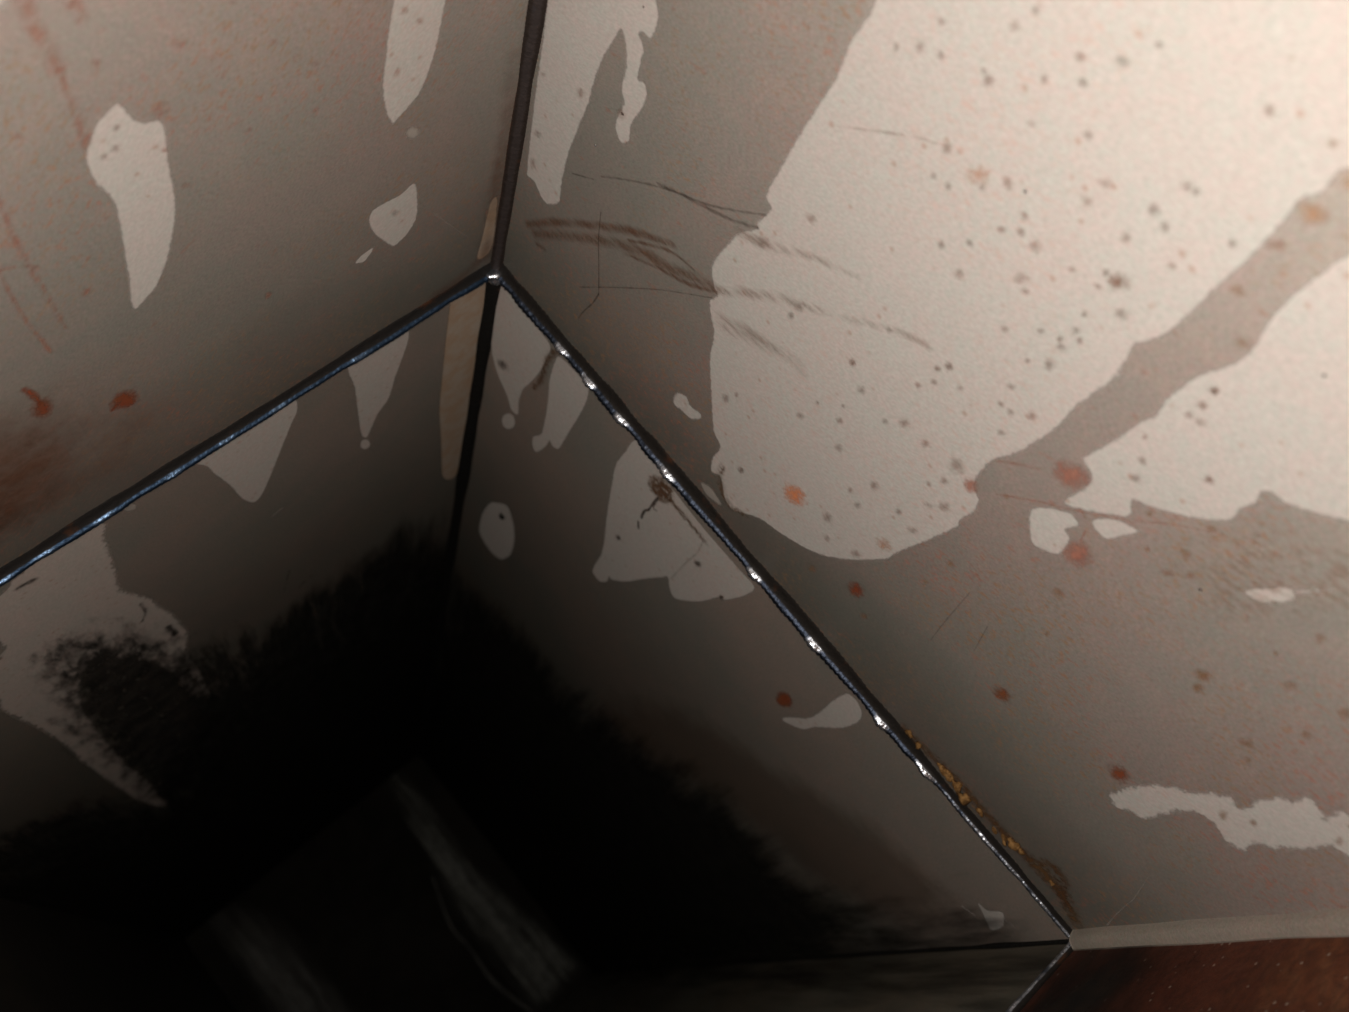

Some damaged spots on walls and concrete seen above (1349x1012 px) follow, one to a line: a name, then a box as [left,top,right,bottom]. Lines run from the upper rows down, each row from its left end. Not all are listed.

peeling [382,0,445,138]
peeling [527,0,658,204]
peeling [86,103,175,309]
peeling [356,183,418,263]
peeling [673,0,1349,560]
peeling [197,400,297,502]
peeling [348,331,409,449]
peeling [592,440,754,602]
peeling [0,523,210,807]
peeling [782,693,862,729]
corrosion [905,730,1079,922]
peeling [1109,783,1349,856]